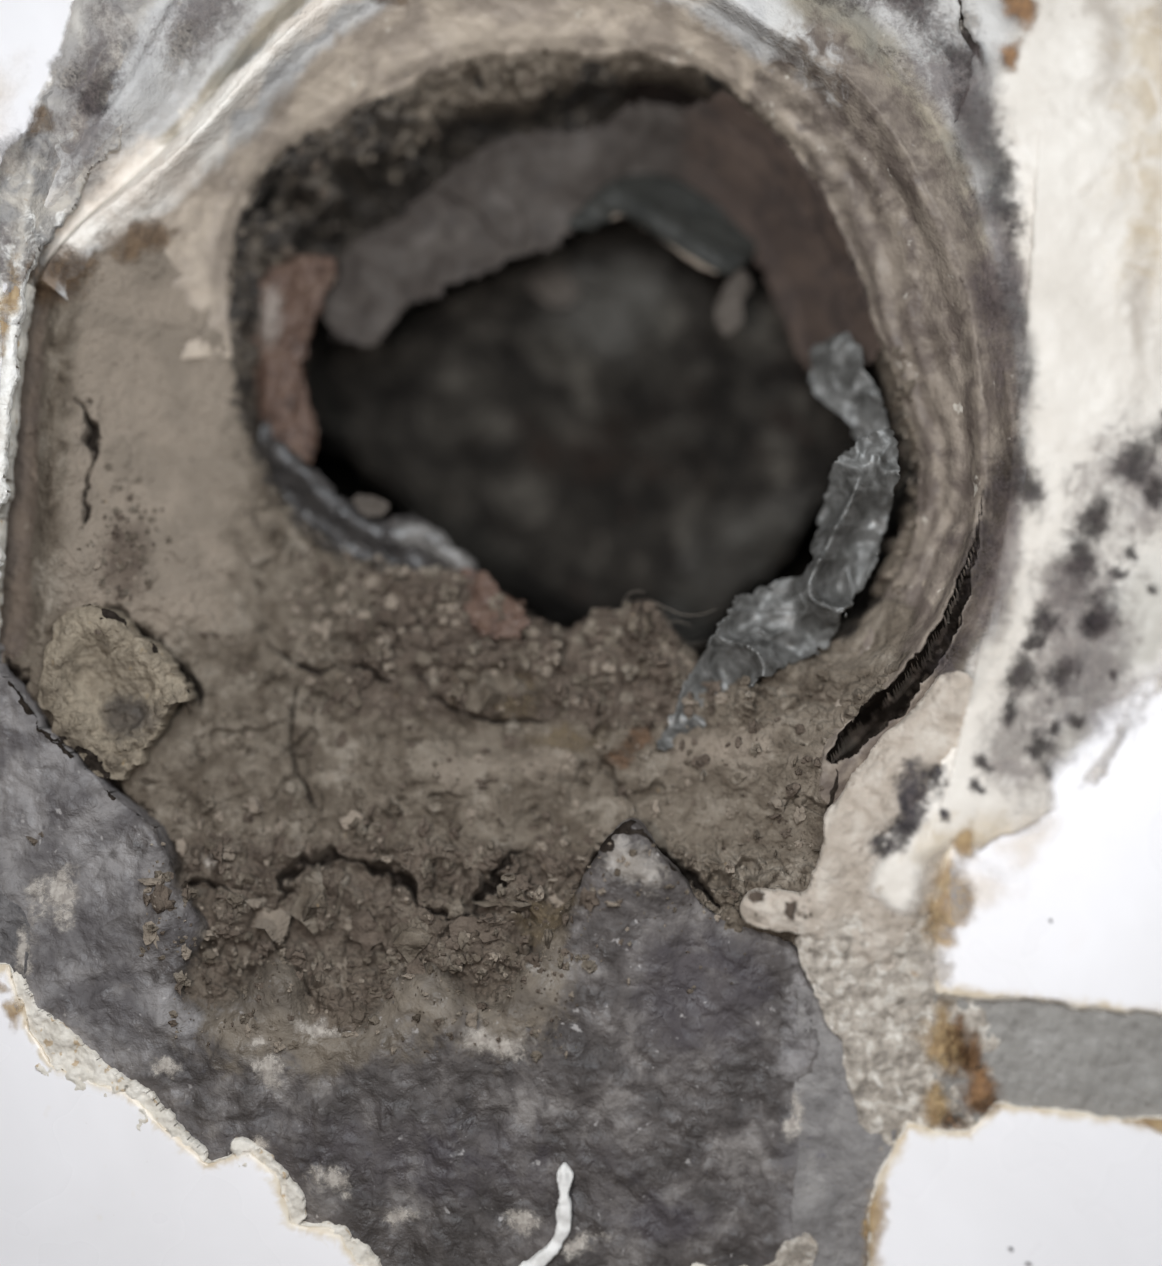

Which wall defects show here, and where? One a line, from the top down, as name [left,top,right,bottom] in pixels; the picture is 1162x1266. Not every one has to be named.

leakage [942,39,1024,237]
leakage [0,39,127,508]
leakage [1002,494,1138,728]
crack [257,643,548,813]
leakage [970,755,994,793]
crack [181,880,229,890]
crack [277,848,528,921]
spalling [740,671,1001,1151]
spalling [12,971,208,1162]
rust [924,1008,998,1129]
spalling [230,1136,307,1225]
peeling [519,1162,574,1266]